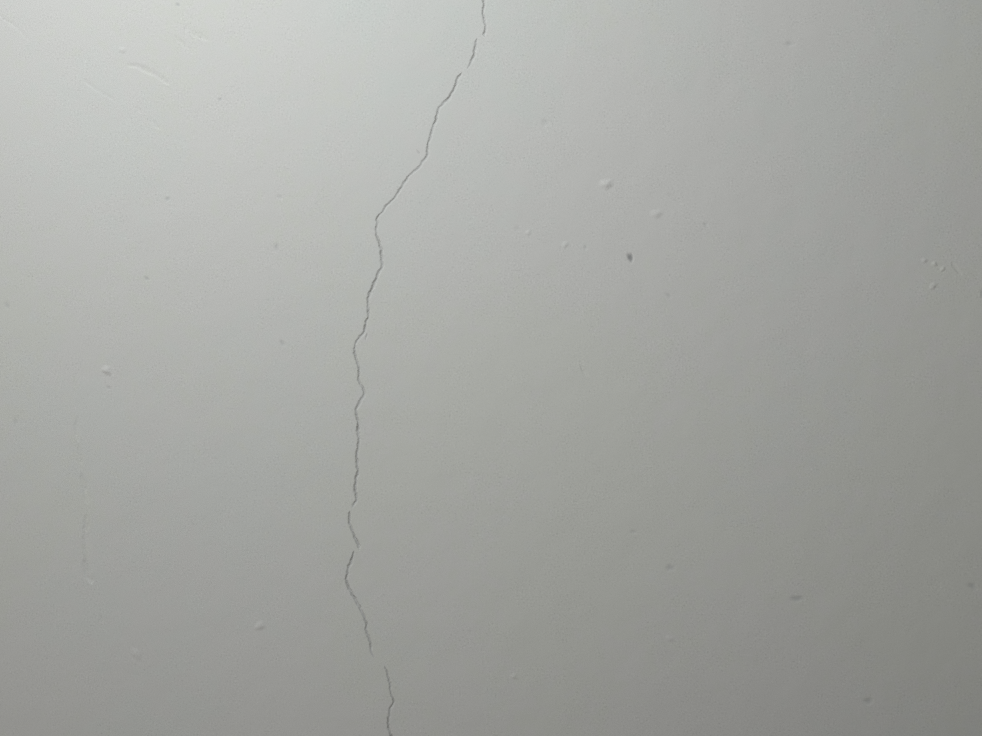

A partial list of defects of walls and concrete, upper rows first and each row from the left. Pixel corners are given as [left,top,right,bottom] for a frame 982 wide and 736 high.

crack [344,0,488,736]